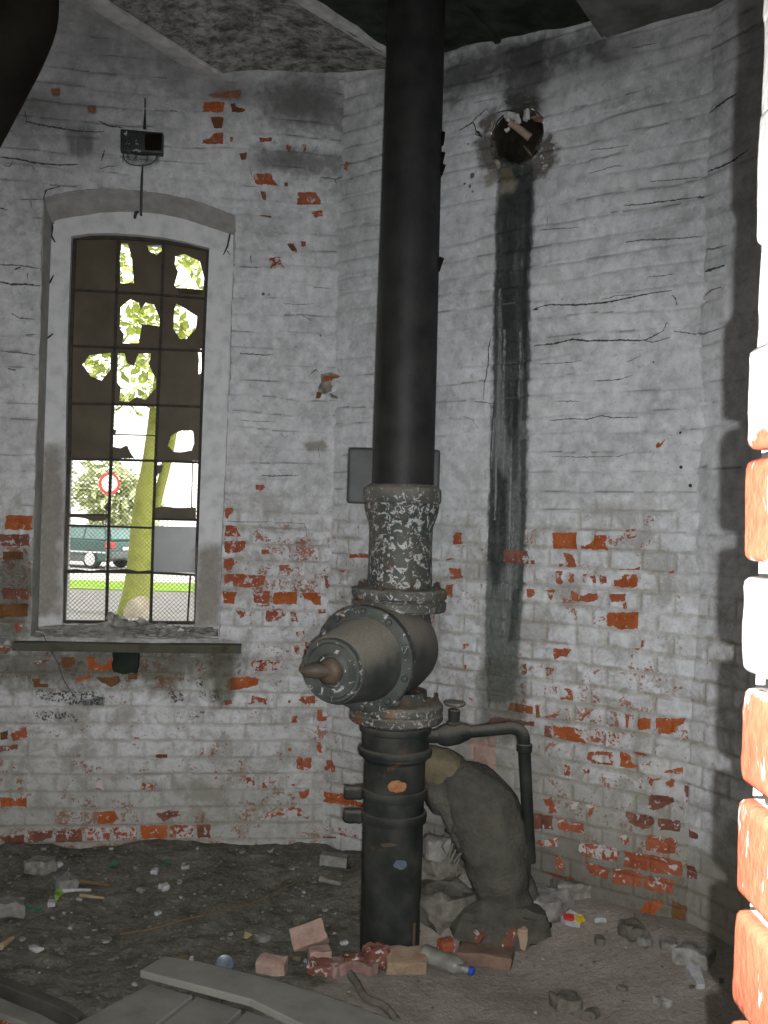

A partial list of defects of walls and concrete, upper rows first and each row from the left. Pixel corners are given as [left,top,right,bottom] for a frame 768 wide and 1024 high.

spalling [463,98,560,194]
crack [589,145,628,174]
crack [624,150,748,206]
crack [710,94,736,113]
crack [625,236,727,296]
crack [533,274,725,381]
damp [494,289,514,601]
peeling [0,515,33,560]
peeling [223,508,345,655]
peeling [526,532,645,650]
peeling [469,648,686,778]
peeling [534,767,698,921]